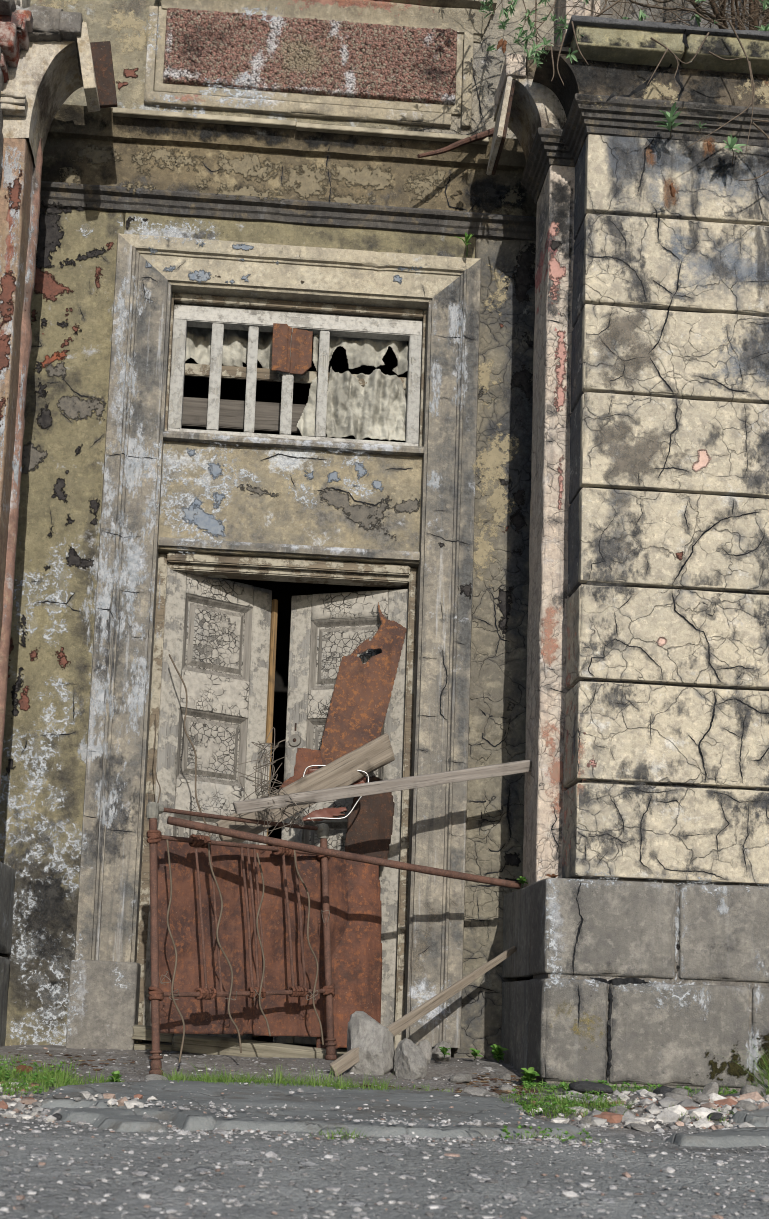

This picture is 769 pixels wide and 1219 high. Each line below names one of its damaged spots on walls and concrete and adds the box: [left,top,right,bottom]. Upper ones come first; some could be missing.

crack [606,29,689,108]
spalling [0,200,115,474]
leakage [548,180,592,318]
crack [589,134,699,580]
leakage [663,71,769,287]
crack [699,322,769,474]
spalling [47,470,75,539]
spalling [66,545,94,569]
leakage [553,423,685,607]
peeling [8,615,40,719]
leakage [0,277,261,1046]
crack [546,501,769,1083]